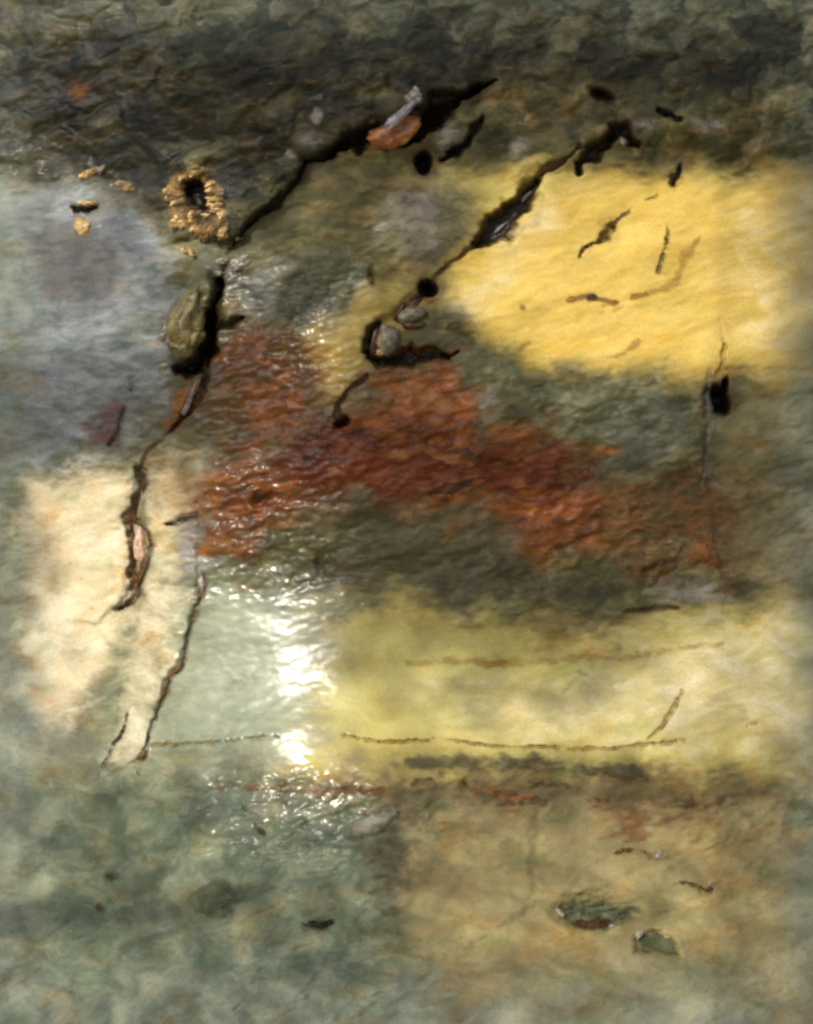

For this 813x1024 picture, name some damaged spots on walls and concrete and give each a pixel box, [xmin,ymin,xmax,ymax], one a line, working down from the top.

water stain [311,97,322,124]
crack [403,81,495,162]
water stain [437,124,463,147]
spalling [163,163,251,277]
crack [413,121,639,301]
crack [579,166,681,258]
crack [114,127,378,612]
corrosion [191,333,615,563]
water stain [177,526,224,582]
crack [100,575,206,773]
water stain [161,581,323,767]
peeling [555,907,620,928]